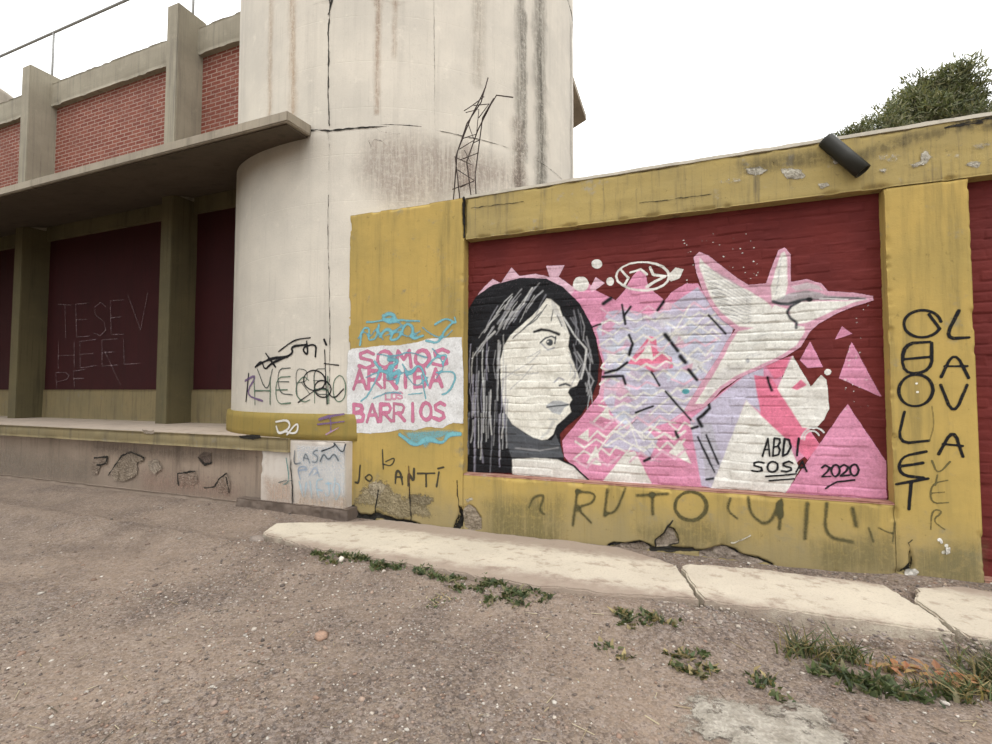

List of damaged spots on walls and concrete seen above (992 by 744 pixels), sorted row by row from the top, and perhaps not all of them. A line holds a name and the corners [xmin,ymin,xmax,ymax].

crack [311,0,505,147]
leakage [537,0,545,184]
peeling [728,166,767,181]
peeling [781,168,805,179]
peeling [910,151,931,167]
flaking render [177,470,230,494]
spalling [354,480,433,519]
crack [607,520,773,565]